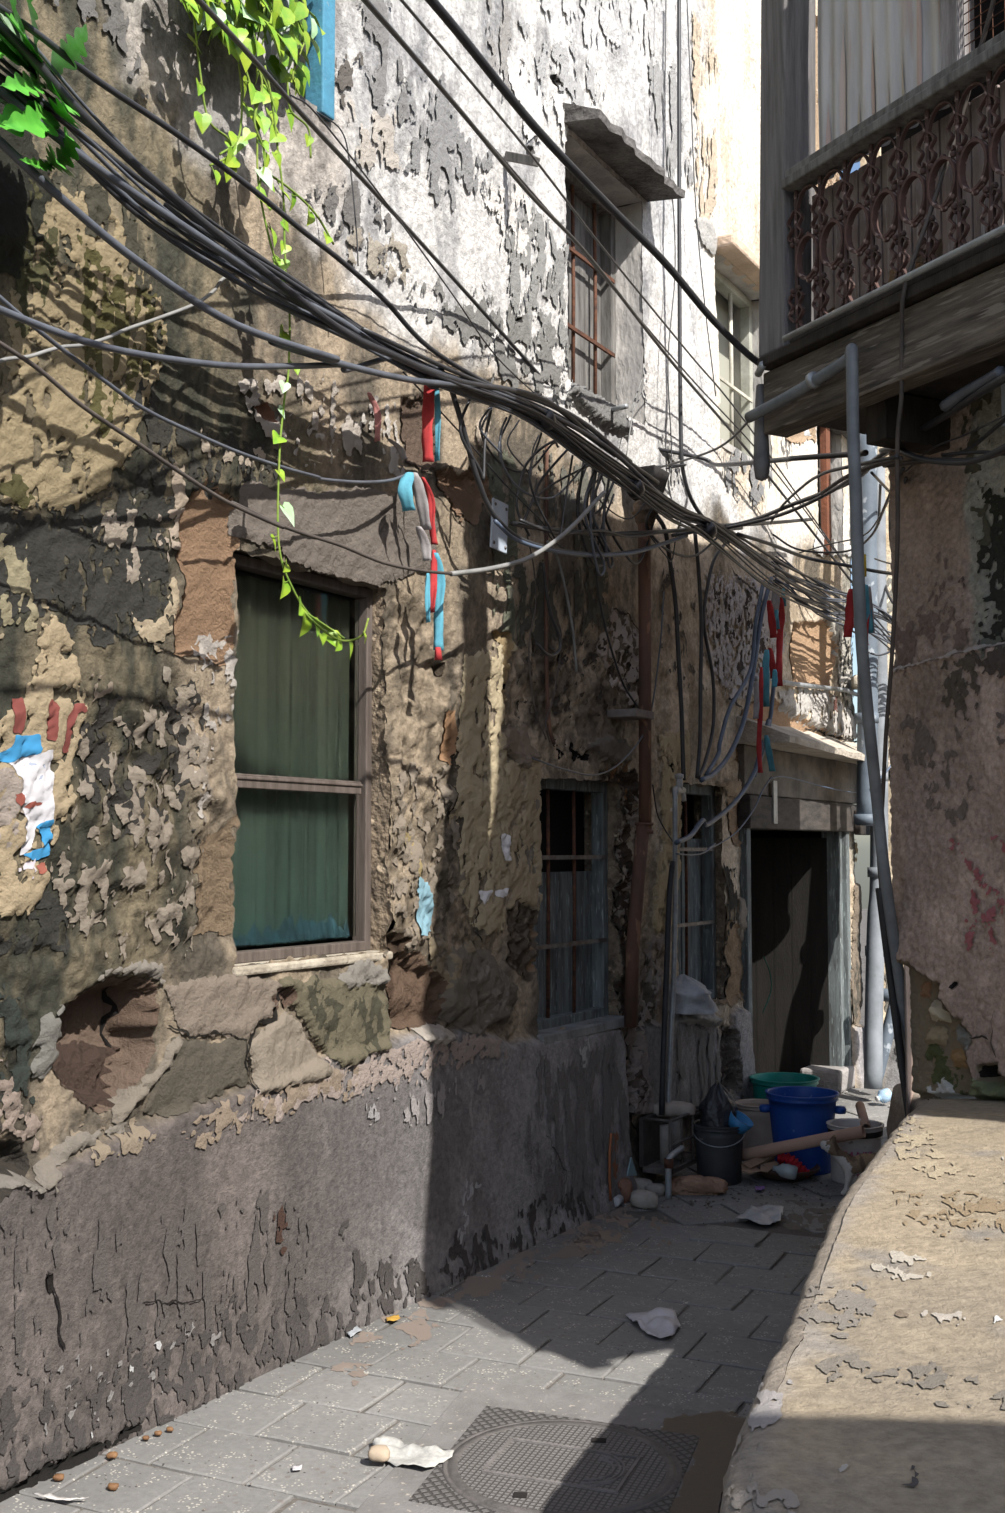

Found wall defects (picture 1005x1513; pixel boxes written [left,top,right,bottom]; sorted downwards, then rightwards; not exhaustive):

peeling [338,227,411,287]
peeling [0,186,168,519]
peeling [476,415,491,448]
spalling [569,379,634,435]
spalling [661,568,775,691]
peeling [0,462,218,963]
peeling [182,607,639,1150]
peeling [599,730,691,1117]
spalling [720,1025,744,1099]
spalling [897,960,1005,1100]
peeling [0,1077,44,1203]
spalling [70,1117,157,1166]